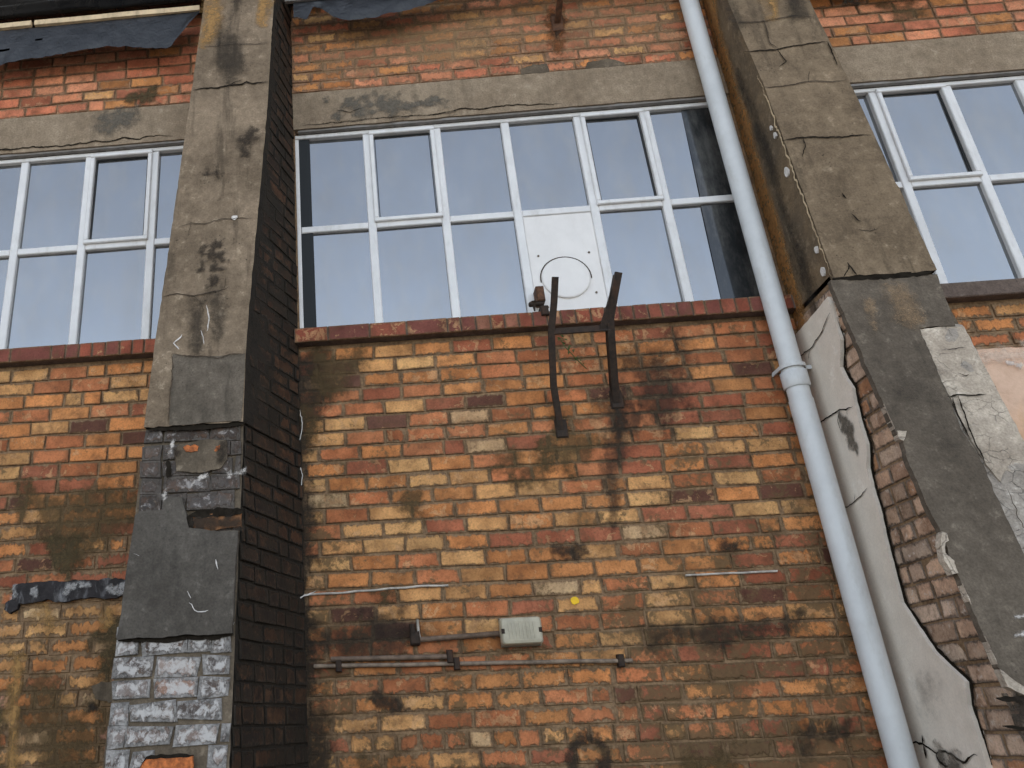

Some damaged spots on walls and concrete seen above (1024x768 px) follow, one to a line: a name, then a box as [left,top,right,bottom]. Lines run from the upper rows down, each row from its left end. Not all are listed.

crack [741,0,847,88]
crack [782,134,865,157]
crack [832,262,933,280]
spalling [881,404,907,443]
spalling [170,439,245,482]
spalling [187,507,244,531]
spalling [935,531,971,604]
spalling [140,753,194,768]
damp [565,731,611,768]